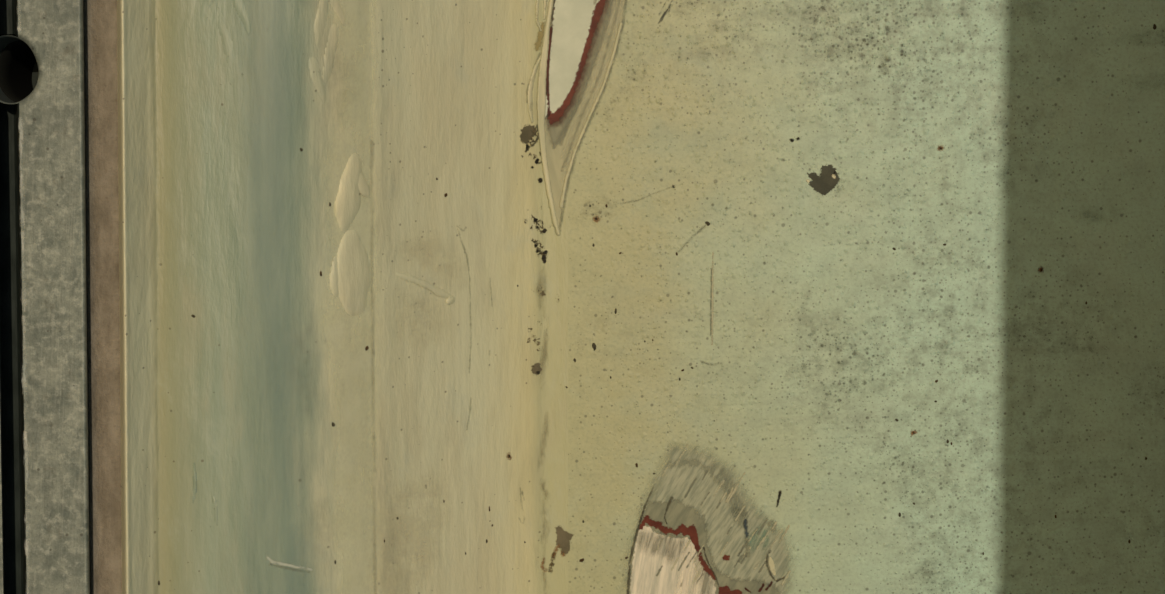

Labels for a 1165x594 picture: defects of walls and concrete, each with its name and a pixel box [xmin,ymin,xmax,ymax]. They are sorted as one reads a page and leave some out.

peeling [520,0,625,235]
peeling [627,445,791,594]